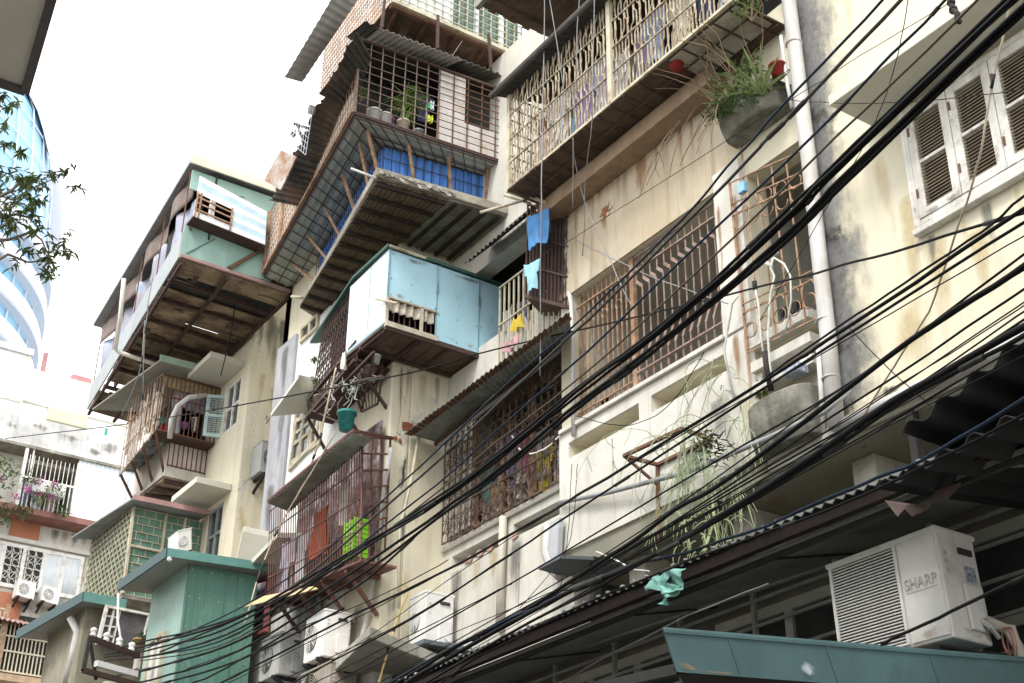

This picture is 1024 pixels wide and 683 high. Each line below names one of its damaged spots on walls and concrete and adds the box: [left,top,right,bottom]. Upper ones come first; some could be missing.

water stain [796,0,866,416]